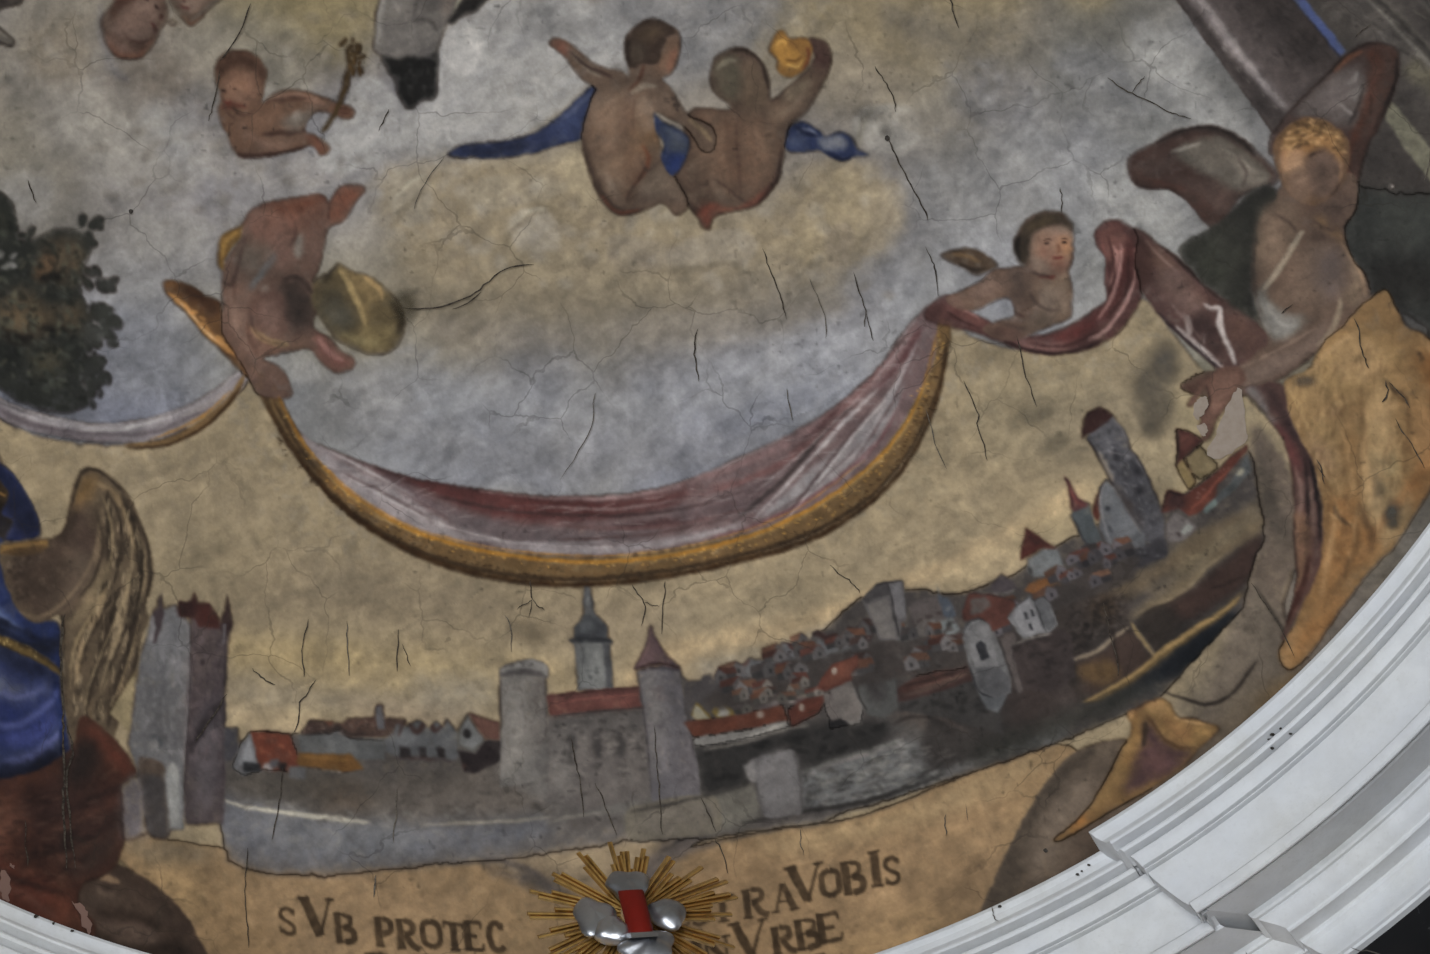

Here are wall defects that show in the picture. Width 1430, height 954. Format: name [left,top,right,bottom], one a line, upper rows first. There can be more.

crack [1108,76,1191,119]
crack [875,67,938,292]
crack [762,248,827,334]
crack [854,274,873,340]
crack [252,622,316,732]
peeling [0,863,15,902]
crack [244,768,283,948]